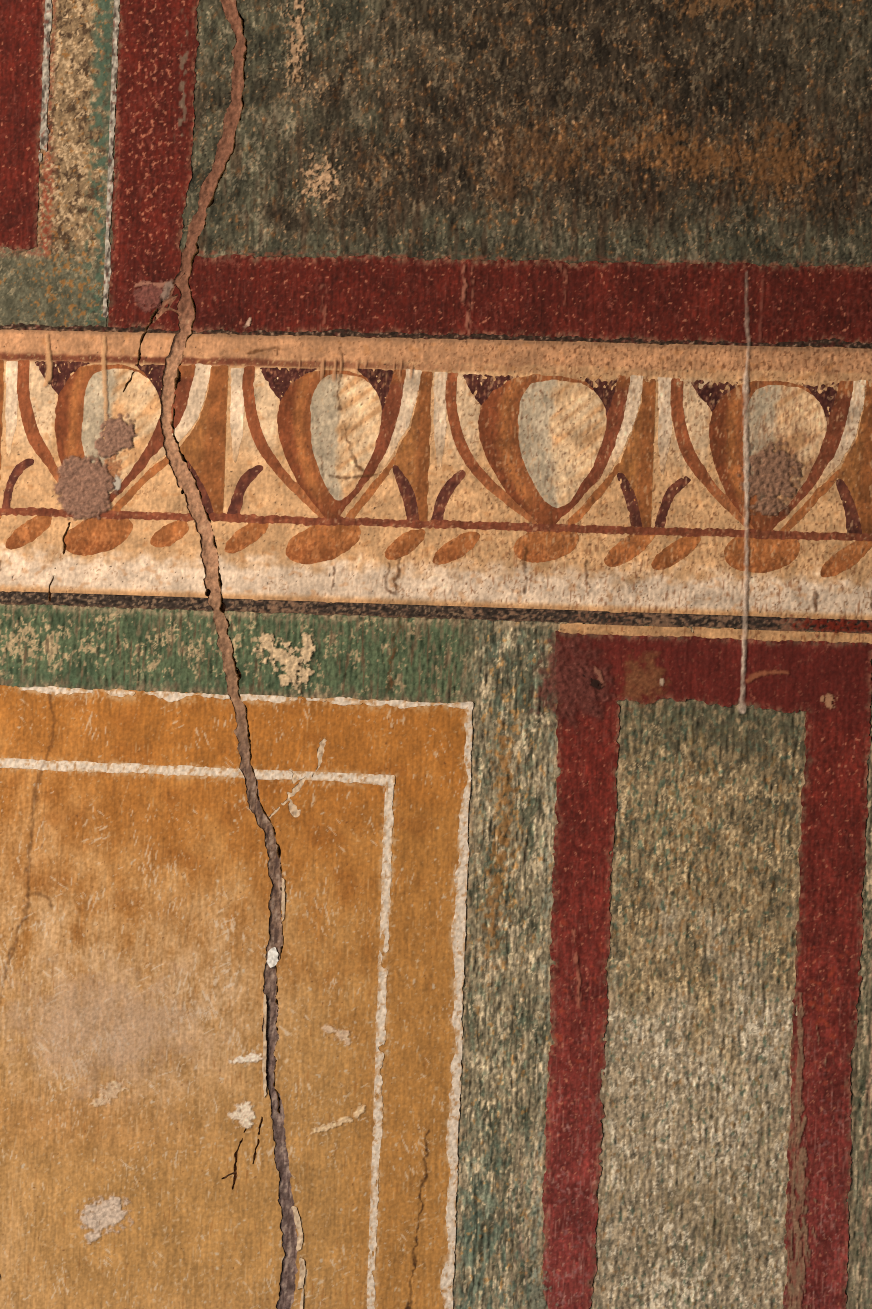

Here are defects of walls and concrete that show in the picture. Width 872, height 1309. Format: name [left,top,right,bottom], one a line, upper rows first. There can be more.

crack [127,0,327,1309]
peeling [251,629,315,693]
spalling [227,1102,255,1128]
spalling [77,1196,133,1244]